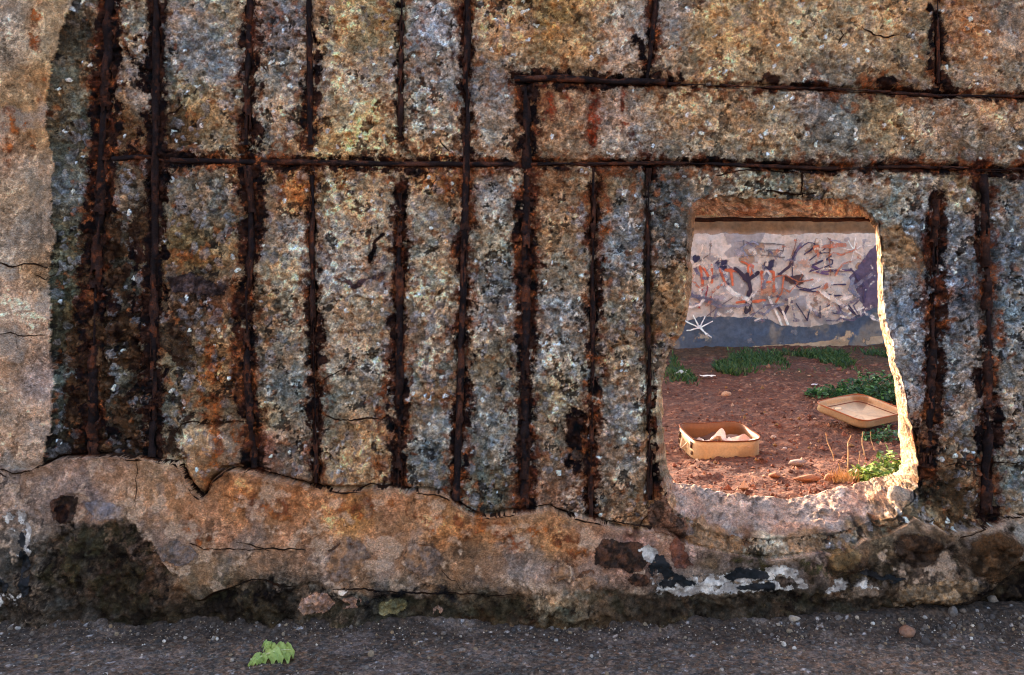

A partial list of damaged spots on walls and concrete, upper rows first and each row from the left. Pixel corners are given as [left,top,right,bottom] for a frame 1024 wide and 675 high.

spalling [40,0,1024,530]
rust [68,0,1024,563]
crack [0,452,667,530]
water stain [37,519,298,628]
crack [197,579,294,601]
crack [190,542,306,551]
water stain [362,584,461,616]
crack [333,571,510,598]
water stain [745,553,911,618]